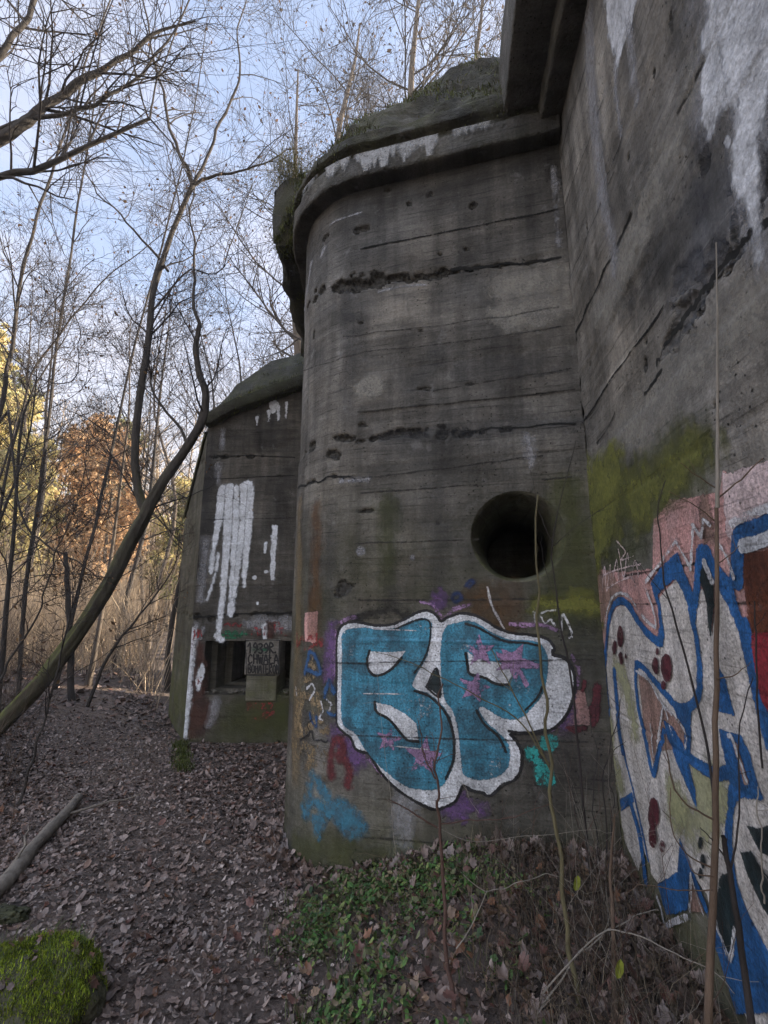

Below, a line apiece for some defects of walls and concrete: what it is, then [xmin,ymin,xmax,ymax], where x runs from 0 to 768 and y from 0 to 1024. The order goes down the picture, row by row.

water stain [584,0,768,328]
crack [209,455,569,494]
spalling [303,423,513,460]
spalling [307,253,511,312]
crack [358,217,768,443]
water stain [524,294,768,631]